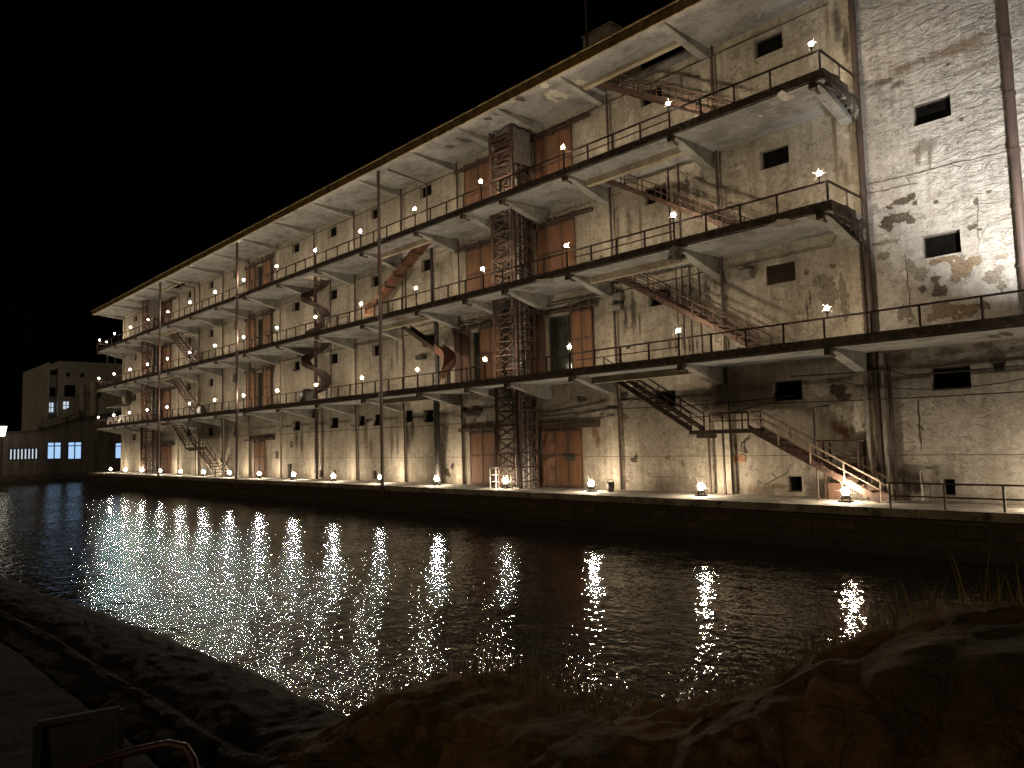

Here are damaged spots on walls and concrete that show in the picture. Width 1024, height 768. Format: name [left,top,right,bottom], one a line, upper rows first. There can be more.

spalling [833,193,917,261]
peeling [804,264,849,322]
peeling [897,254,1010,324]